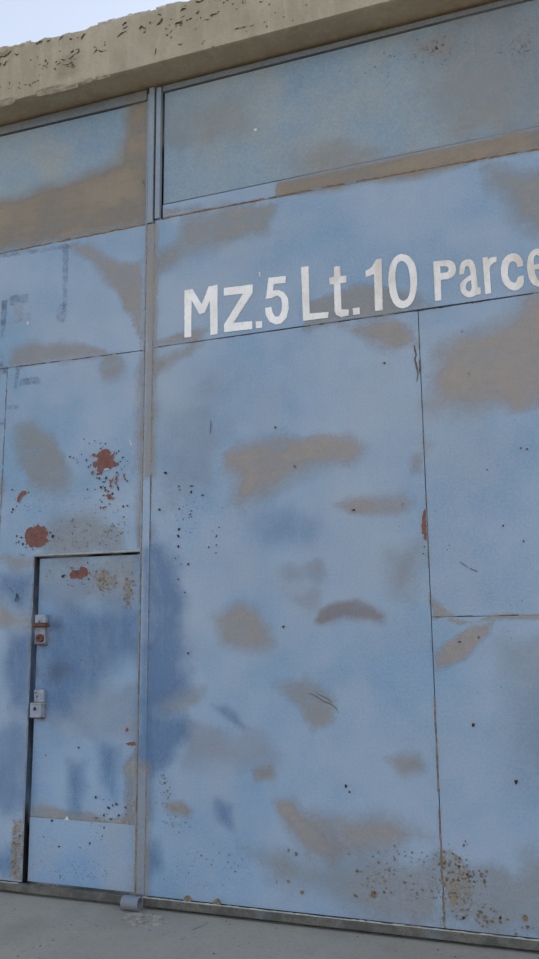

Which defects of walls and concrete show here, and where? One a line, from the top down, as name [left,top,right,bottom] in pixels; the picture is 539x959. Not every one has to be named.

spalling [98,0,246,45]
spalling [0,80,78,107]
corrosion [351,841,537,935]